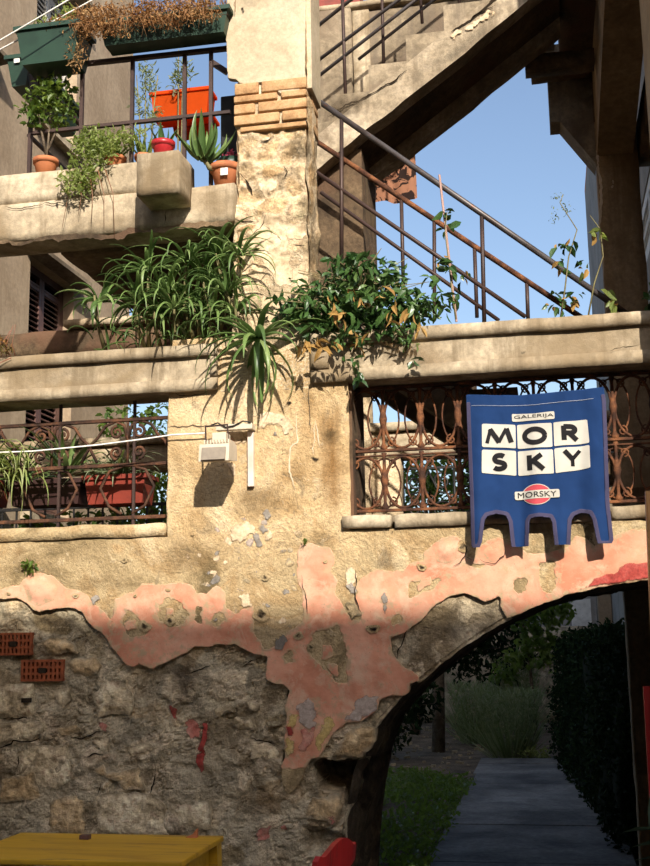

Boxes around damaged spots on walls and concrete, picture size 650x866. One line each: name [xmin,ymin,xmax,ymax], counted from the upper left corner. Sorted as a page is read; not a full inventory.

crack [451,0,495,32]
flaking render [451,10,495,39]
crack [330,70,407,116]
flaking render [215,509,273,559]
flaking render [0,529,648,866]